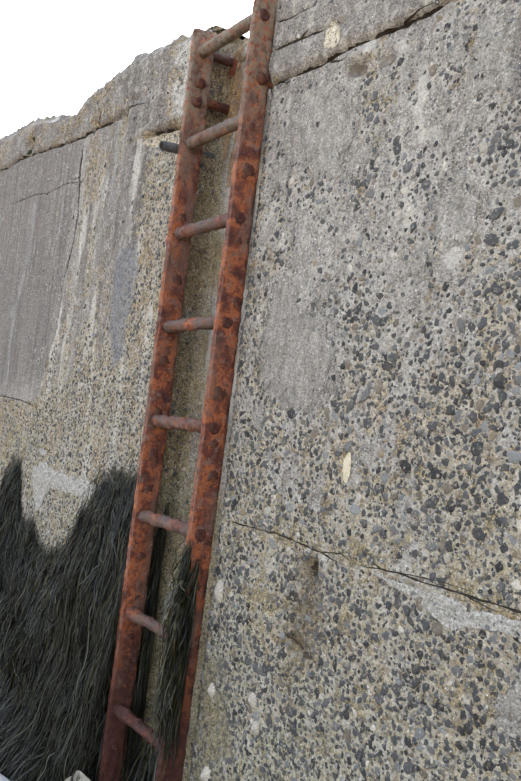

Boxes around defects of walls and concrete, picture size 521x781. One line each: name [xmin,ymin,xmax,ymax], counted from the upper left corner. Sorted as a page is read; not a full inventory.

rust [226,45,246,118]
crack [275,0,444,86]
crack [1,103,146,275]
crack [231,521,521,613]